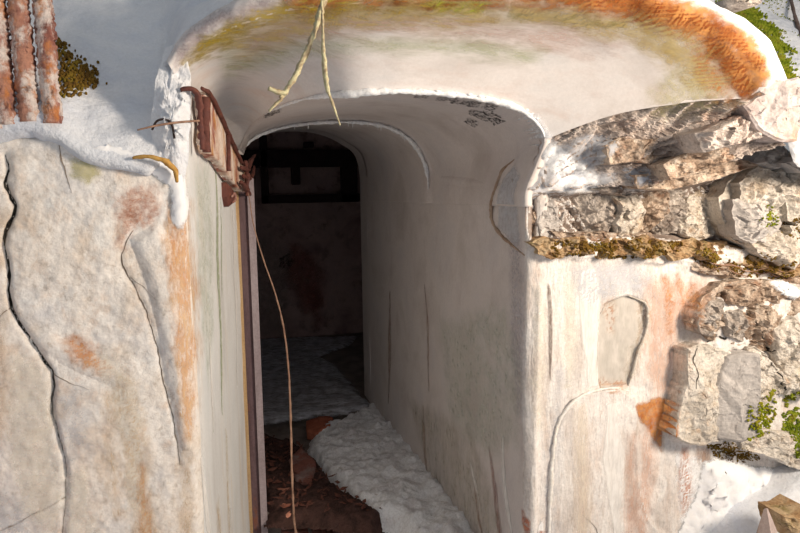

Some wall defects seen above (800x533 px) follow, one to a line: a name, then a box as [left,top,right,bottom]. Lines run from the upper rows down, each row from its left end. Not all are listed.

crack [59,145,72,193]
crack [0,155,88,533]
crack [121,230,180,463]
corrosion [167,217,198,436]